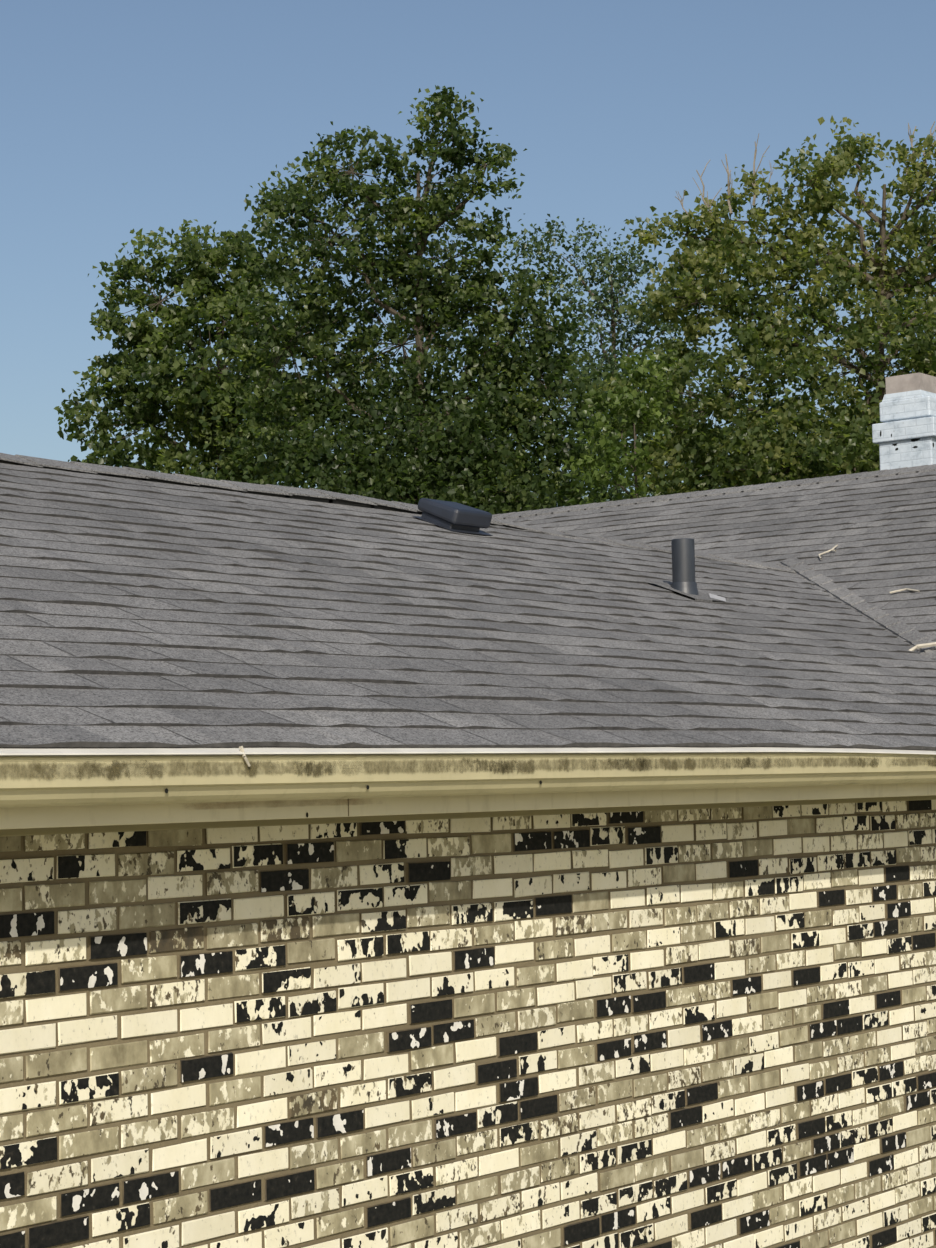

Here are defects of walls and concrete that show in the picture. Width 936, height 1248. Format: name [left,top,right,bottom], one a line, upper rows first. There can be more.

damp [1,758,877,778]
flaking render [453,873,590,924]
peeling [179,821,451,1057]
flaking render [0,933,147,998]
flaking render [597,954,715,1017]
flaking render [597,1031,667,1073]
peeling [61,1073,119,1104]
flaking render [248,1110,364,1148]
flaking render [659,1083,733,1129]
flaking render [797,1062,936,1110]
peeling [0,1137,57,1200]
flaking render [211,1170,315,1246]